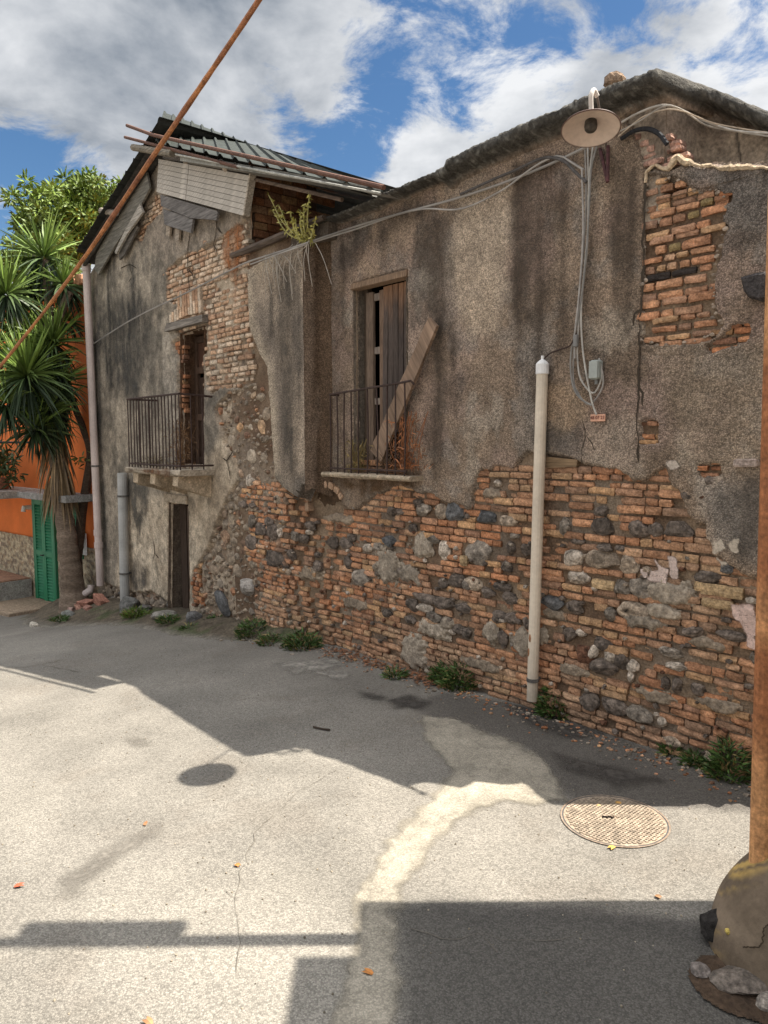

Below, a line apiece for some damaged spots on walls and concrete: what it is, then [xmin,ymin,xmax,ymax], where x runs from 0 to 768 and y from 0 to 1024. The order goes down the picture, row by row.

crack [632,183,646,462]
spalling [634,133,768,353]
spalling [163,224,757,777]